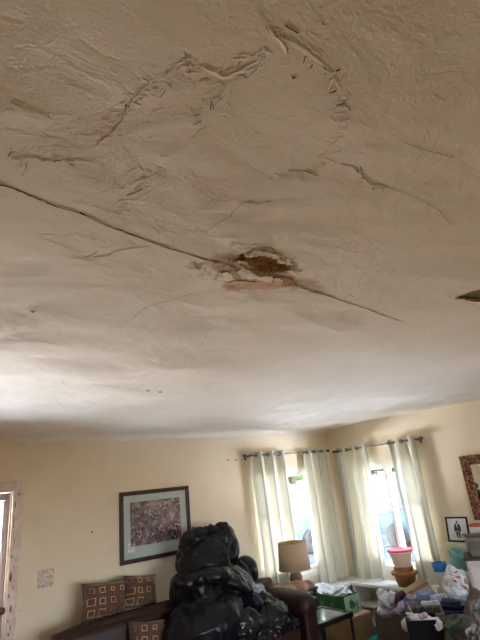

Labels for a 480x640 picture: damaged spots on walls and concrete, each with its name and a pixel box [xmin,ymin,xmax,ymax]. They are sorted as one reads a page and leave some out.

crack [269,162,456,227]
crack [0,181,272,274]
flaking render [204,244,302,291]
crack [294,283,403,322]